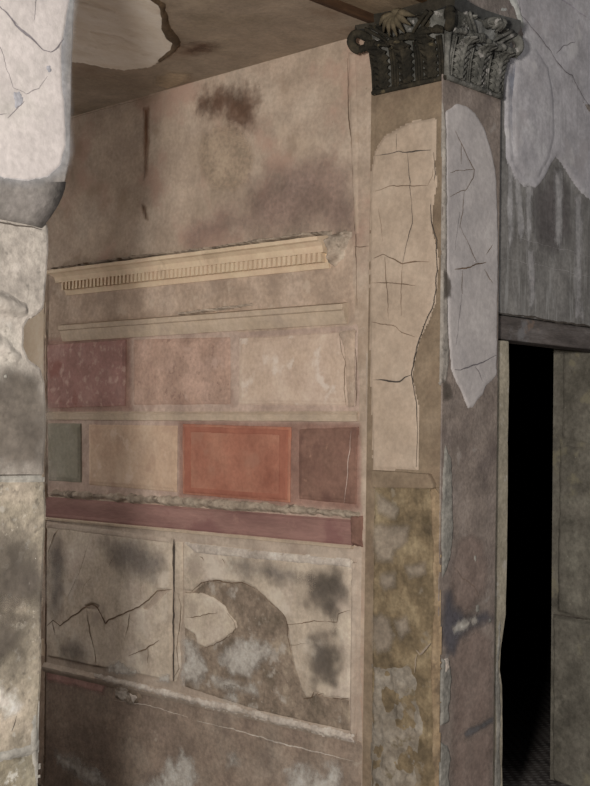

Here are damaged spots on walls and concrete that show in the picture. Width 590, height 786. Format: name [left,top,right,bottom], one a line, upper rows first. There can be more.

crack [0,1,64,52]
flaking render [72,0,181,71]
damp [199,90,252,124]
crack [354,135,493,462]
spalling [439,103,452,398]
damp [507,163,583,319]
crack [339,335,357,402]
crack [48,551,349,677]
spalling [181,581,350,731]
damp [313,644,336,685]
damp [309,574,344,615]
spalling [370,446,453,786]